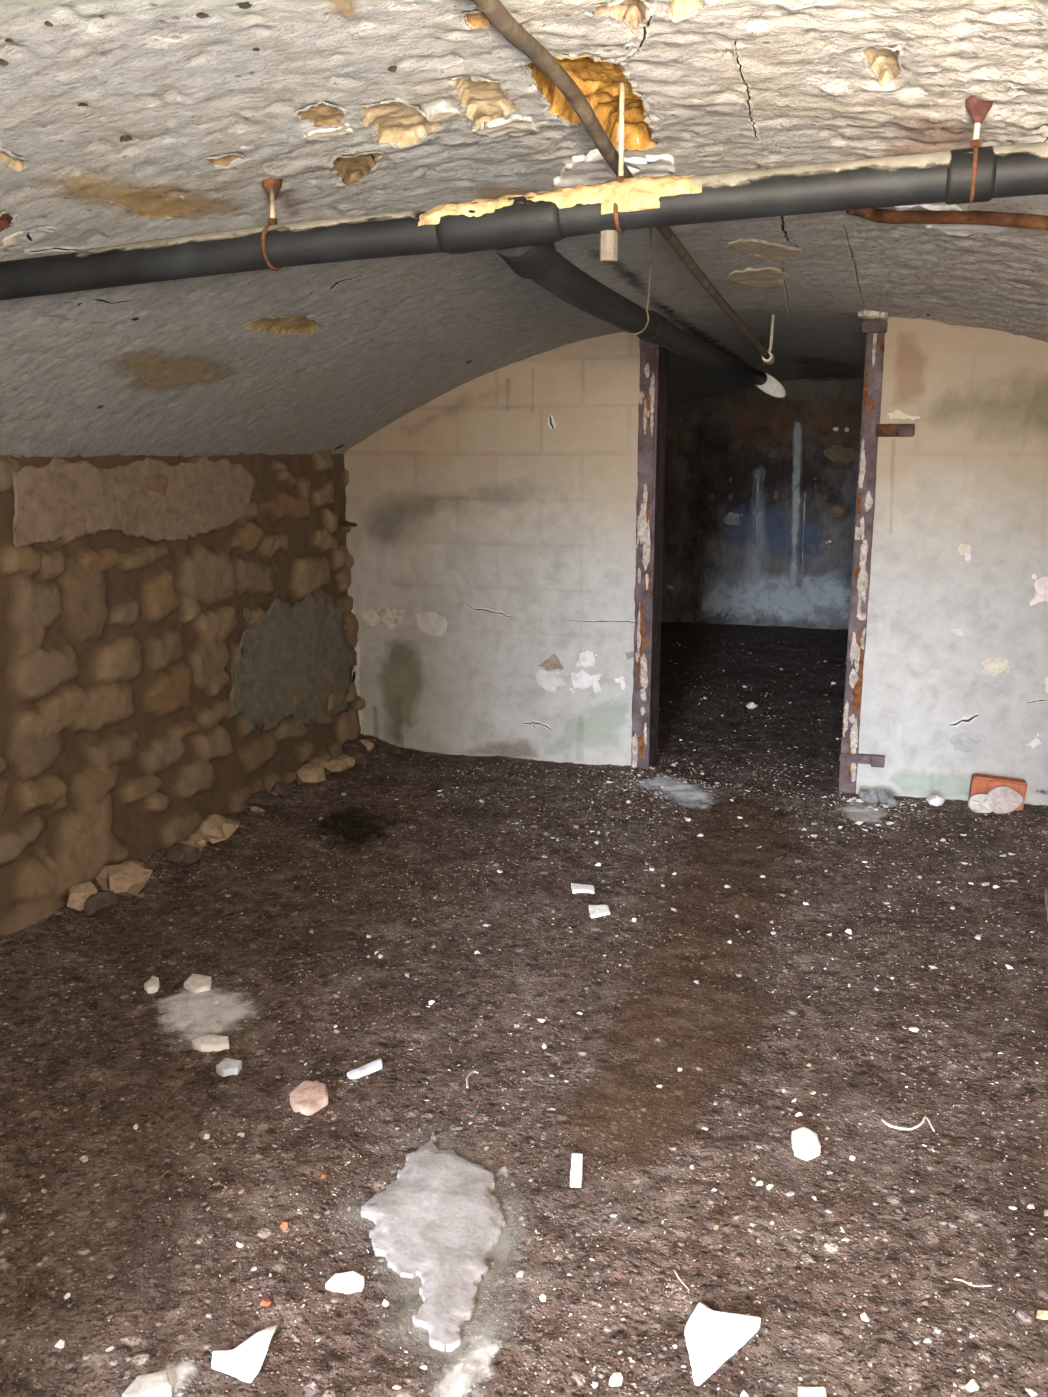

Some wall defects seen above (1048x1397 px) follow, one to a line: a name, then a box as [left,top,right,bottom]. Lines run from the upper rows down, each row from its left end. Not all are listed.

crack [615,15,654,64]
spalling [0,147,32,173]
damp [64,177,238,217]
spalling [293,52,676,190]
corrosion [642,391,655,427]
damp [696,422,851,622]
peeling [535,484,651,768]
corrosion [636,579,651,682]
peeling [1030,574,1048,606]
corrosion [845,635,864,777]